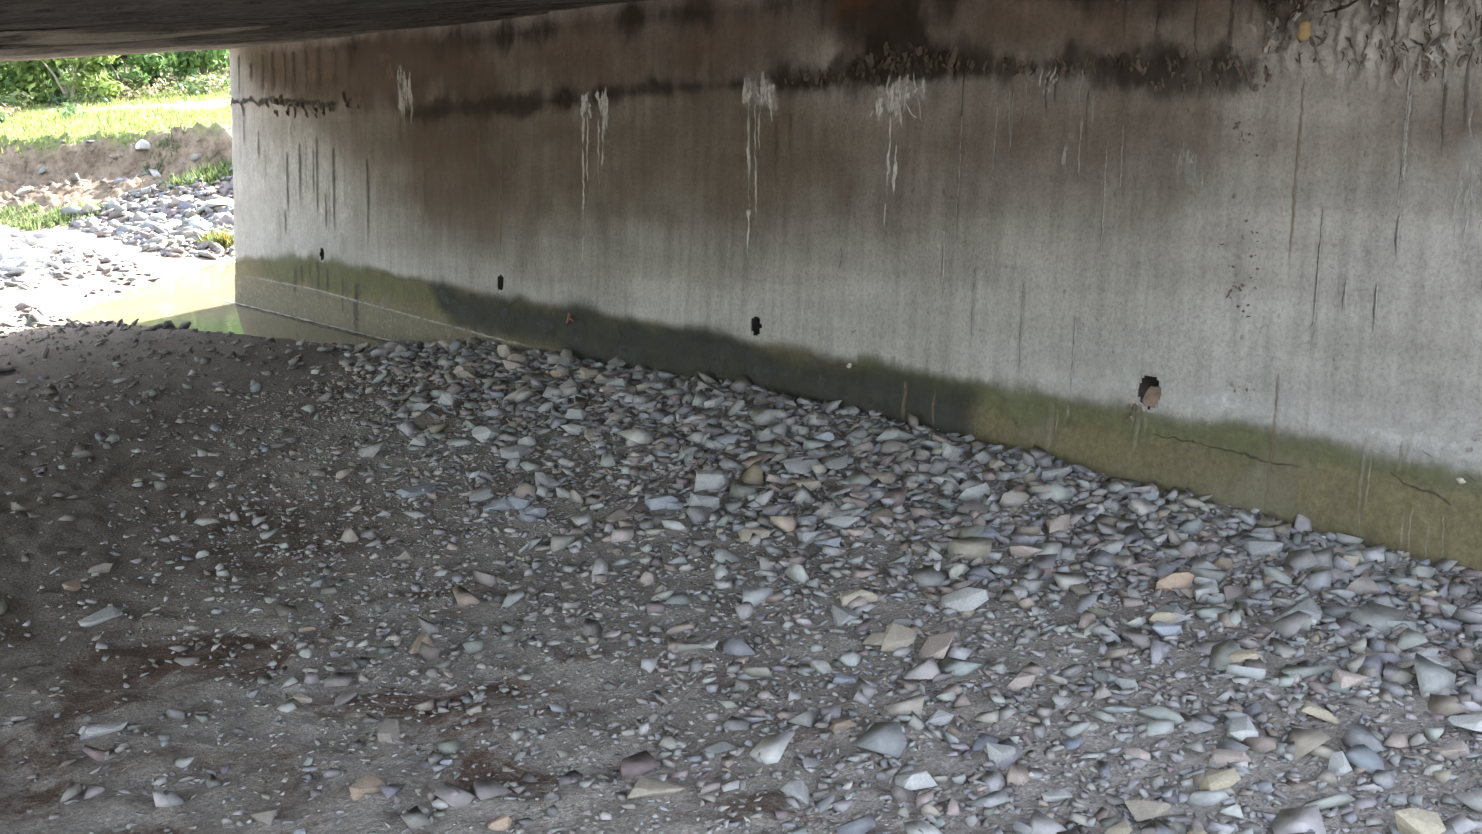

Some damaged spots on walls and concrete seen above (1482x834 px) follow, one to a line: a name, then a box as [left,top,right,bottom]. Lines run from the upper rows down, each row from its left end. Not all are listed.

crack [230,96,334,117]
leakage [0,0,1305,273]
leakage [234,121,1482,571]